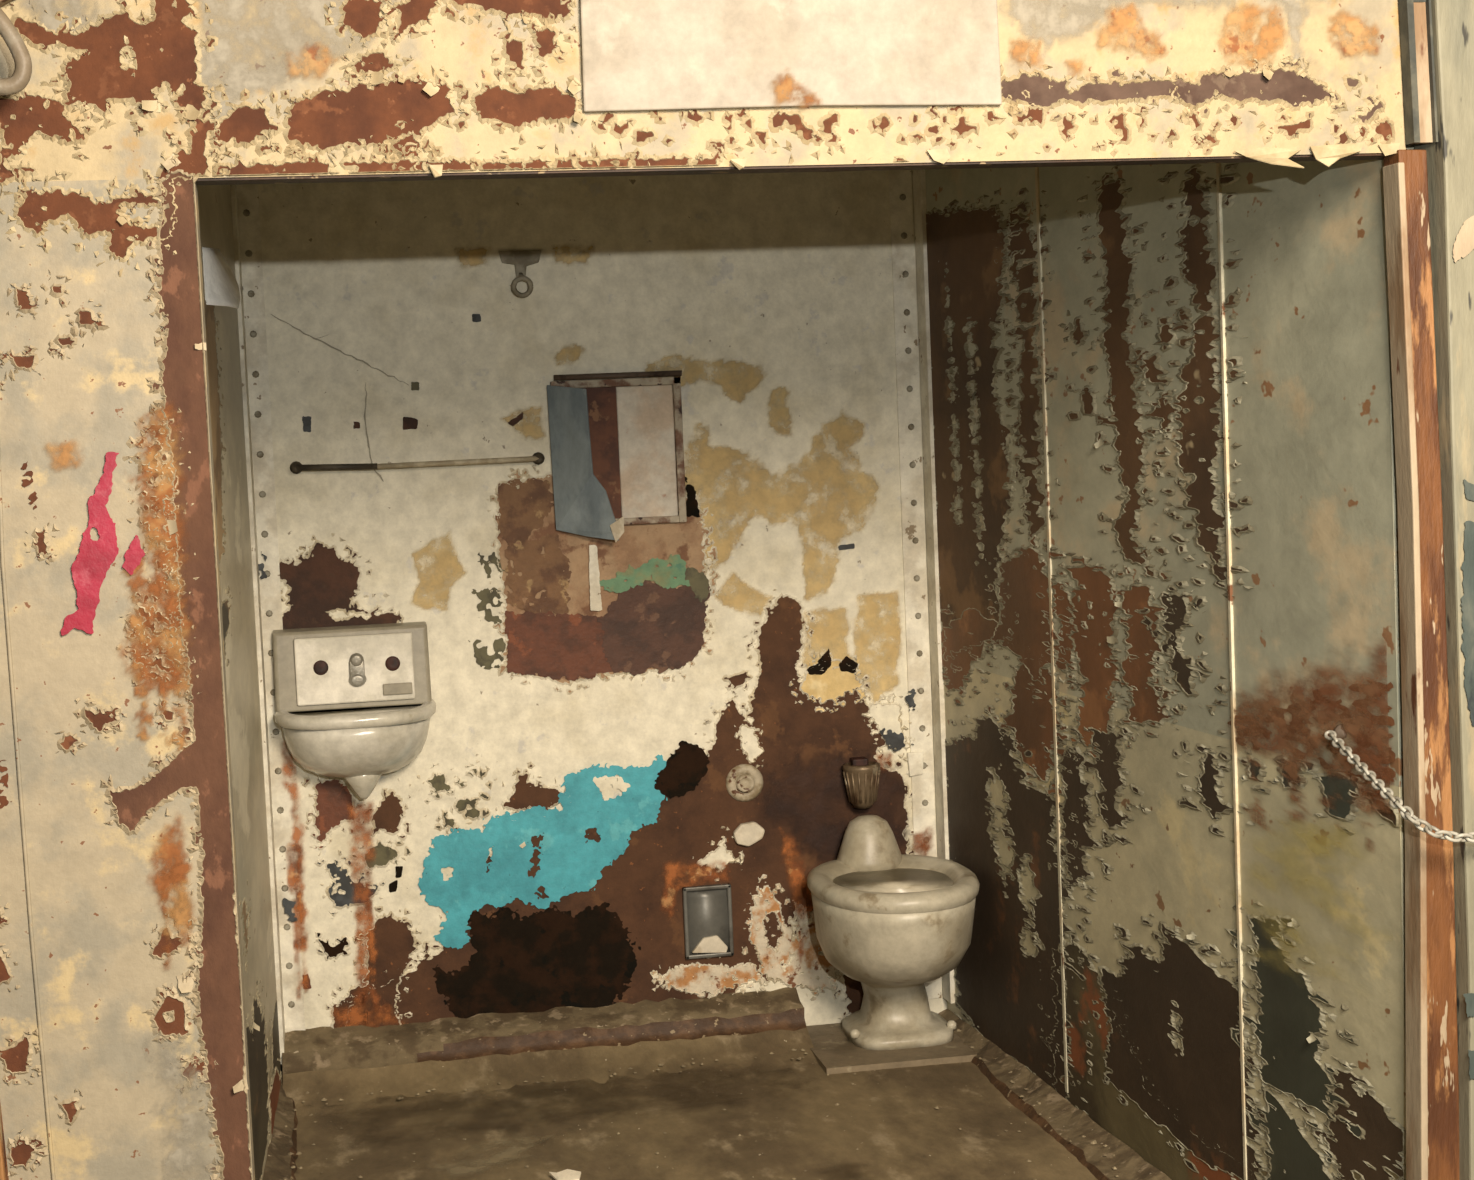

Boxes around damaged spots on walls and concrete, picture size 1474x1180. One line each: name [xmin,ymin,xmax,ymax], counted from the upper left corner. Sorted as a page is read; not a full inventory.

peeling [0,0,846,277]
spalling [0,270,110,391]
spalling [54,698,128,756]
peeling [204,299,234,666]
peeling [258,533,413,661]
rust [100,142,727,1180]
peeling [468,465,721,695]
peeling [302,589,917,1029]
peeling [855,0,1406,1180]
rust [1233,646,1394,821]
spalling [0,1027,42,1086]
peeling [239,880,283,1180]